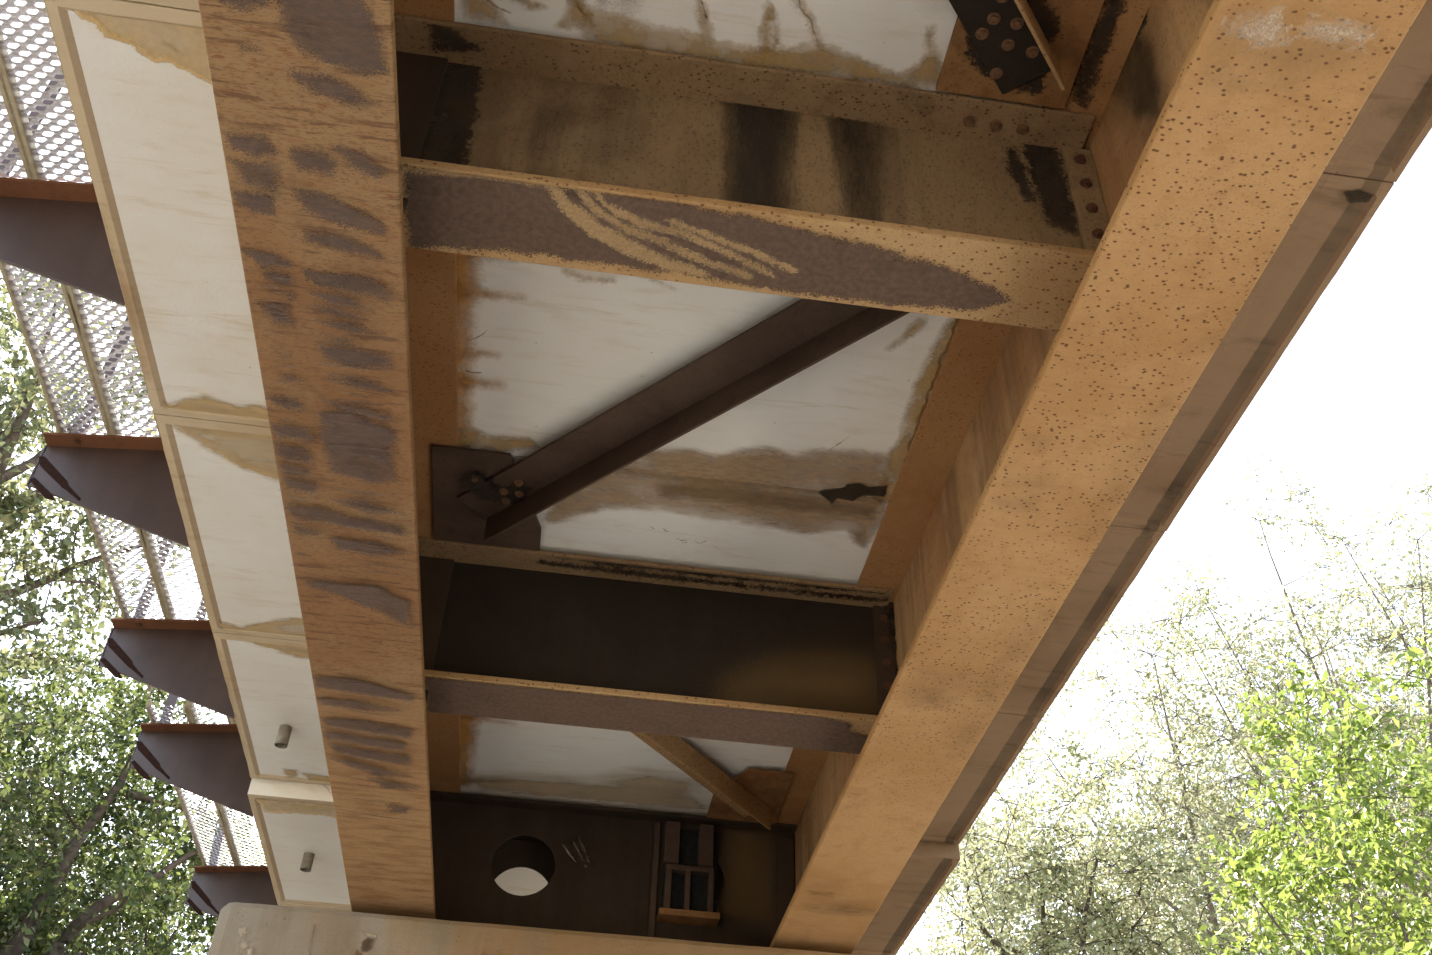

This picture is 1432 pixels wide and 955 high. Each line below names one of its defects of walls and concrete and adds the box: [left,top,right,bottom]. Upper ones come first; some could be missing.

water stain [73,10,212,84]
water stain [220,0,391,113]
water stain [585,11,941,86]
water stain [1027,0,1062,43]
corrosion [401,167,799,280]
water stain [224,24,1011,536]
water stain [163,247,412,629]
water stain [219,618,309,658]
water stain [256,675,868,823]